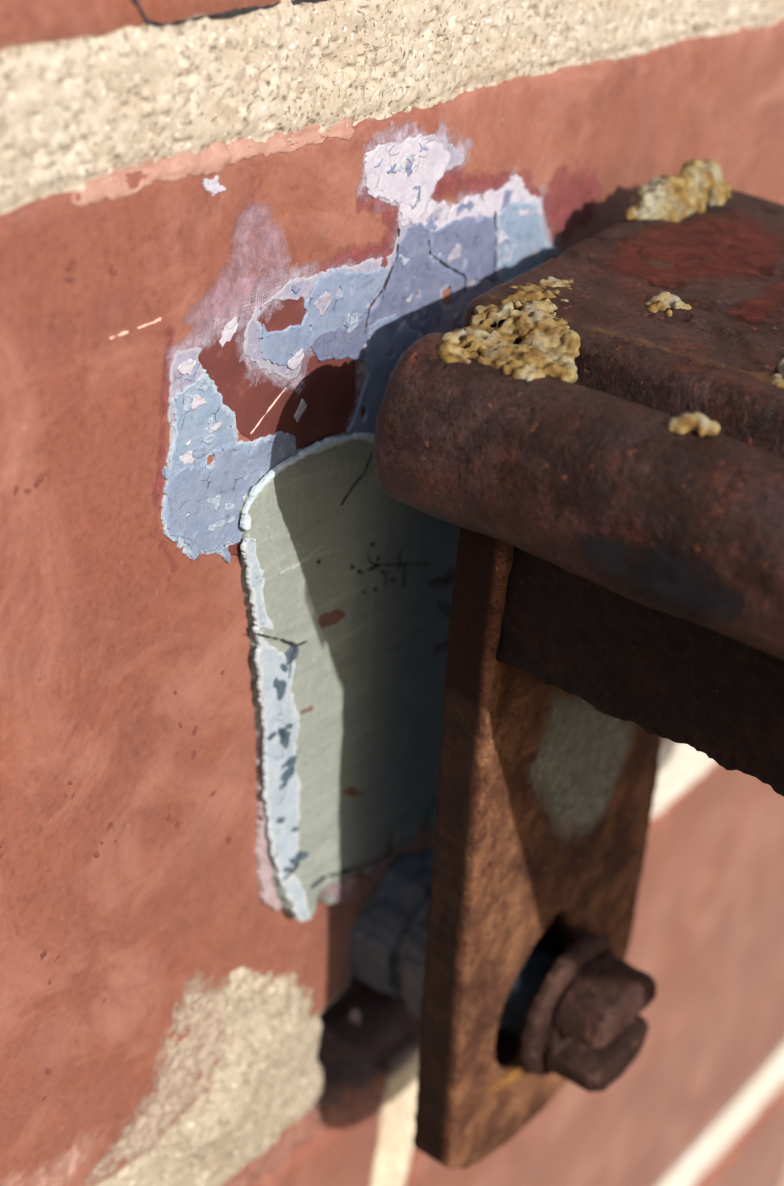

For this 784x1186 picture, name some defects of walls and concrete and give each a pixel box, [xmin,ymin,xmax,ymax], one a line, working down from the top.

spalling [72,119,355,206]
peeling [161,134,559,922]